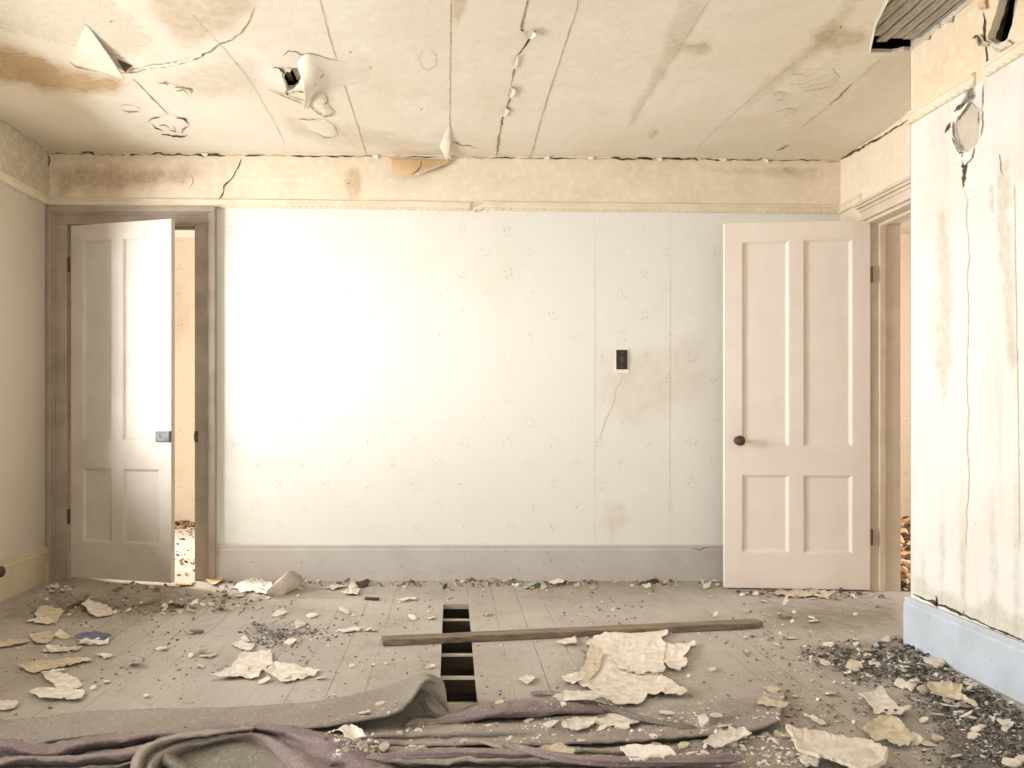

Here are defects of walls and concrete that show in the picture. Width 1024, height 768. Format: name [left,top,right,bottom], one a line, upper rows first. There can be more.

spalling [972,0,1018,53]
leakage [0,52,117,91]
peeling [262,68,298,95]
crack [41,0,906,199]
spalling [945,102,983,165]
crack [961,162,970,546]